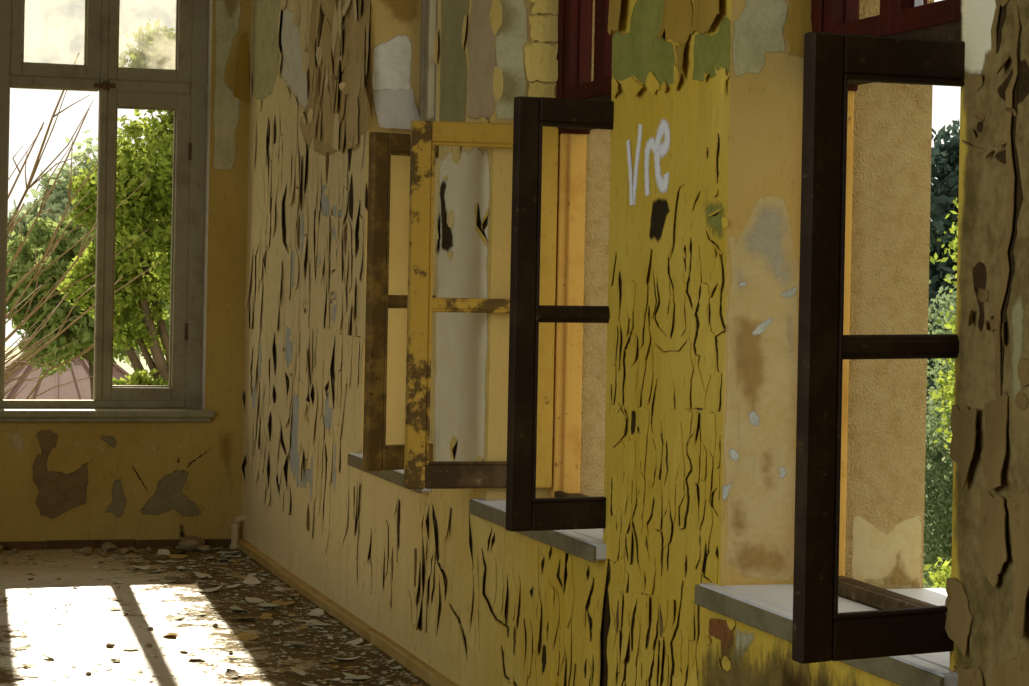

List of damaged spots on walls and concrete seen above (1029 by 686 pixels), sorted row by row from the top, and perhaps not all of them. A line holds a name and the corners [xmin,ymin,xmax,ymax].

peeling [433,0,558,123]
peeling [608,0,812,98]
peeling [961,0,1009,91]
spalling [997,56,1029,116]
spalling [985,142,1007,163]
peeling [213,0,420,608]
peeling [752,318,773,335]
spalling [22,424,204,525]
peeling [406,500,450,636]
crack [423,503,467,660]
crack [467,514,517,686]
crack [529,433,718,686]